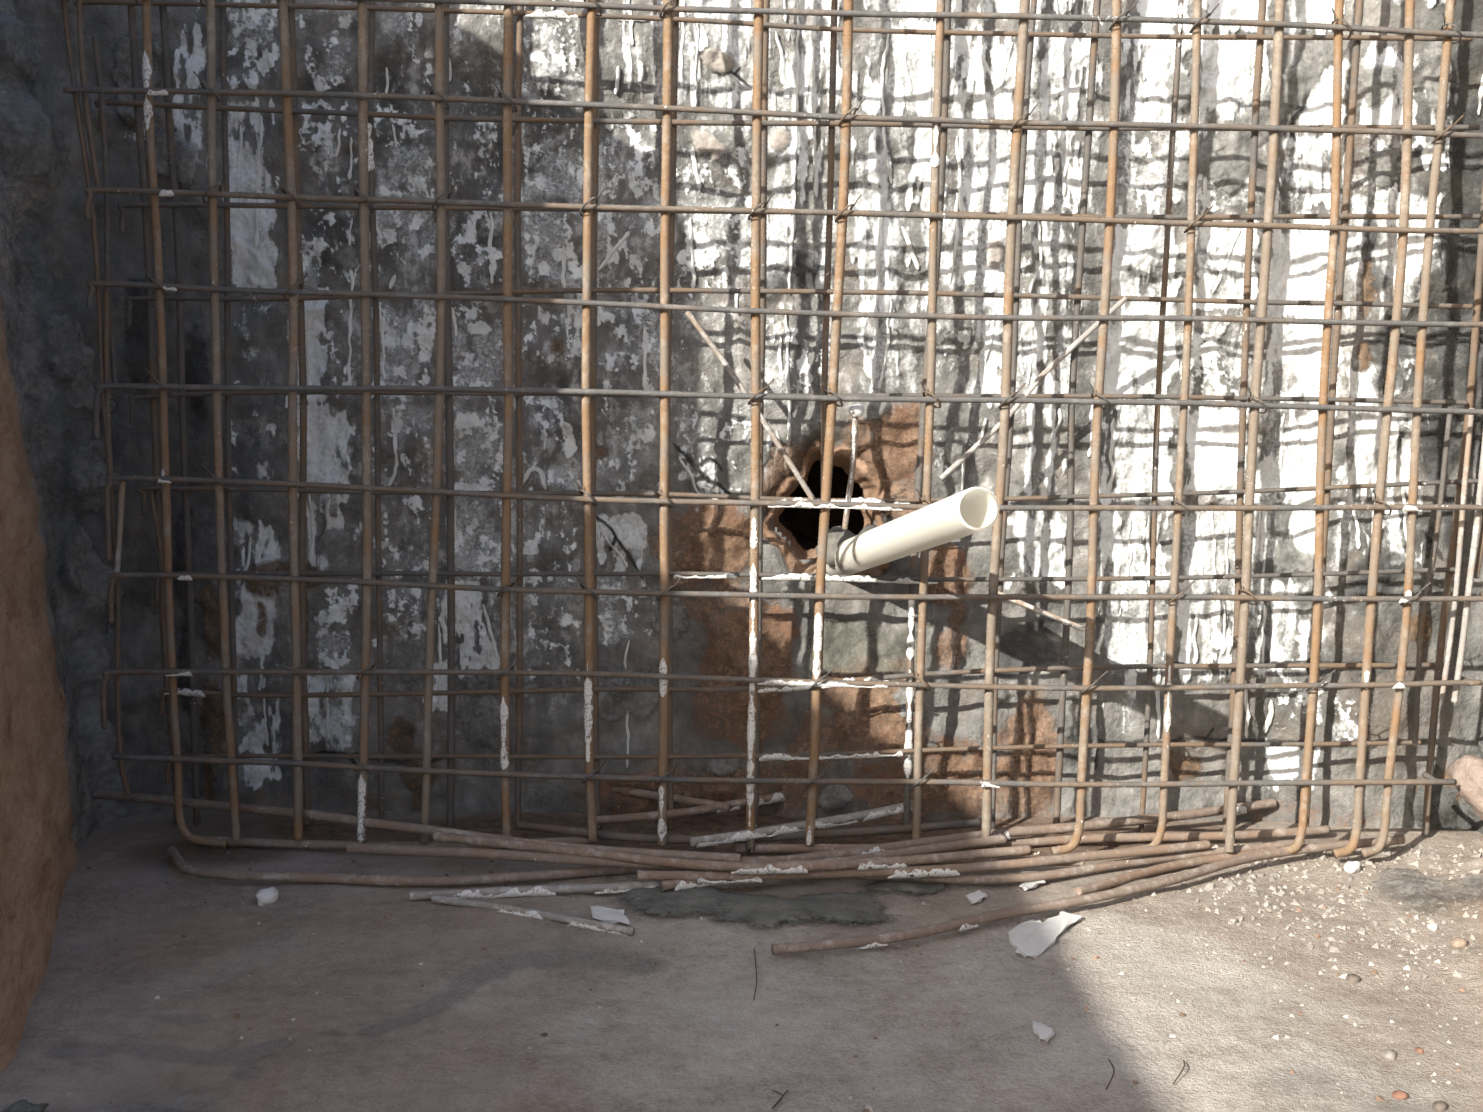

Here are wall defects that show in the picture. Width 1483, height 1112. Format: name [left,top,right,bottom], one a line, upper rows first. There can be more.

leakage [172,1,208,173]
leakage [222,0,280,360]
leakage [231,412,277,445]
leakage [256,462,269,480]
spalling [749,443,821,496]
leakage [285,0,1483,791]
leakage [233,517,282,790]